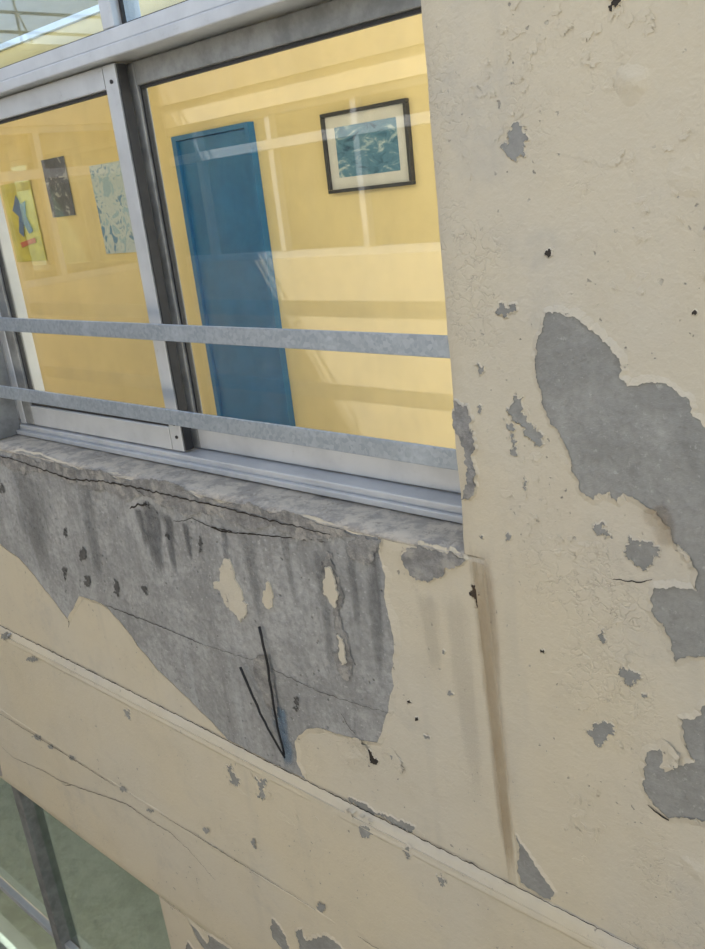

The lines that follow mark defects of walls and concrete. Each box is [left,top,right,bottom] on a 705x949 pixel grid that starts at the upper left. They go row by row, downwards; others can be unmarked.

peeling [608,0,623,12]
peeling [500,120,531,163]
crack [1,456,330,542]
spalling [452,398,483,501]
peeling [505,304,705,667]
spalling [401,541,468,583]
spalling [0,449,413,780]
crack [0,625,638,949]
peeling [586,719,617,748]
peeling [638,699,705,828]
peeling [514,832,558,901]
peeling [269,916,344,949]